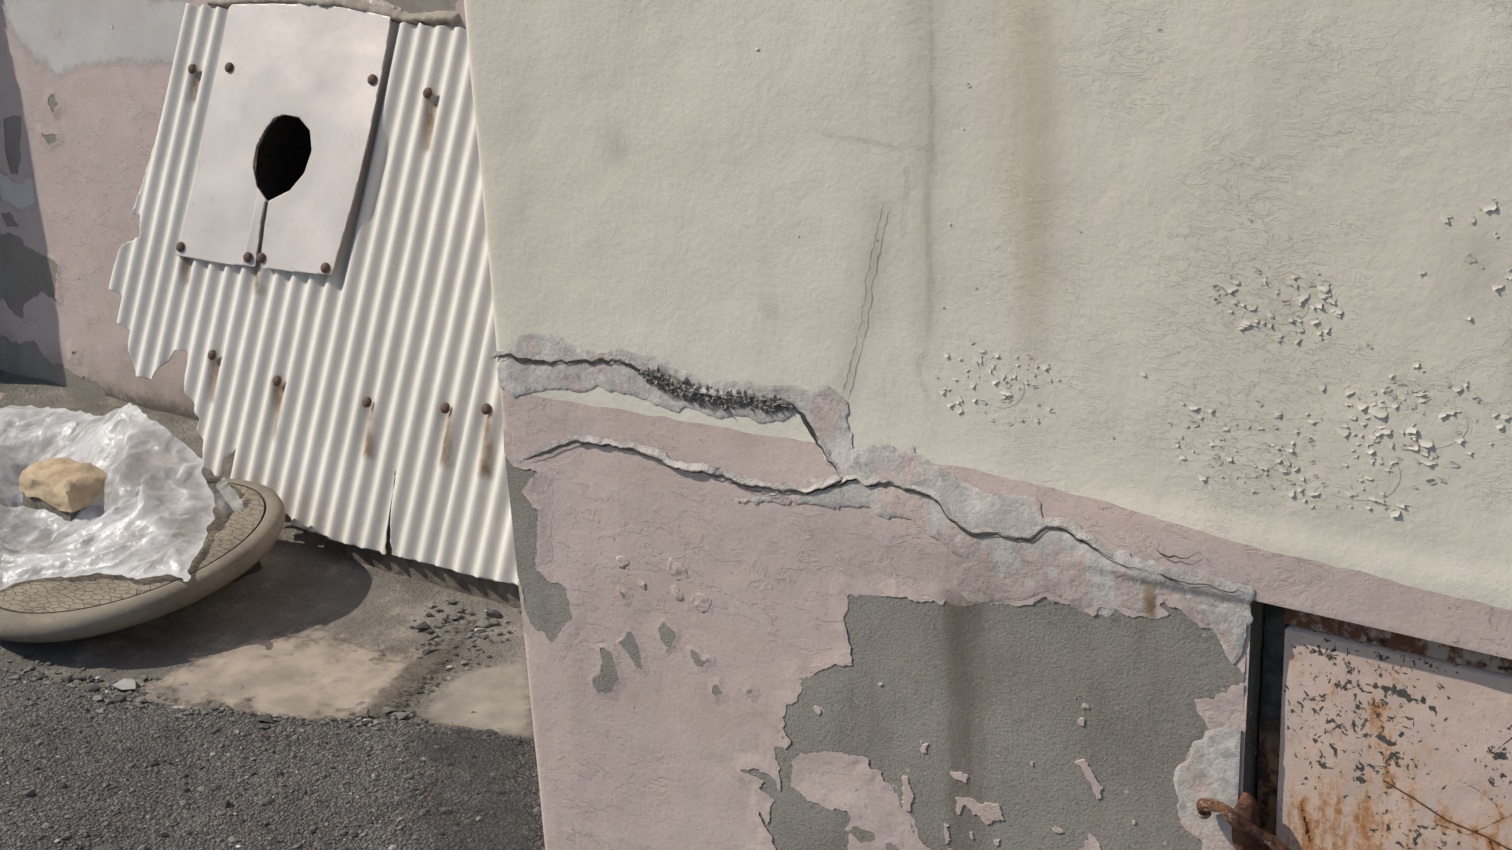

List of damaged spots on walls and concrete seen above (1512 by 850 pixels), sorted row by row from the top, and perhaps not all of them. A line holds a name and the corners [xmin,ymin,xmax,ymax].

peeling [382,0,466,28]
crack [842,201,886,395]
rust [276,385,284,409]
rust [481,415,489,473]
peeling [503,429,586,662]
crack [490,350,1246,594]
peeling [588,571,1247,850]